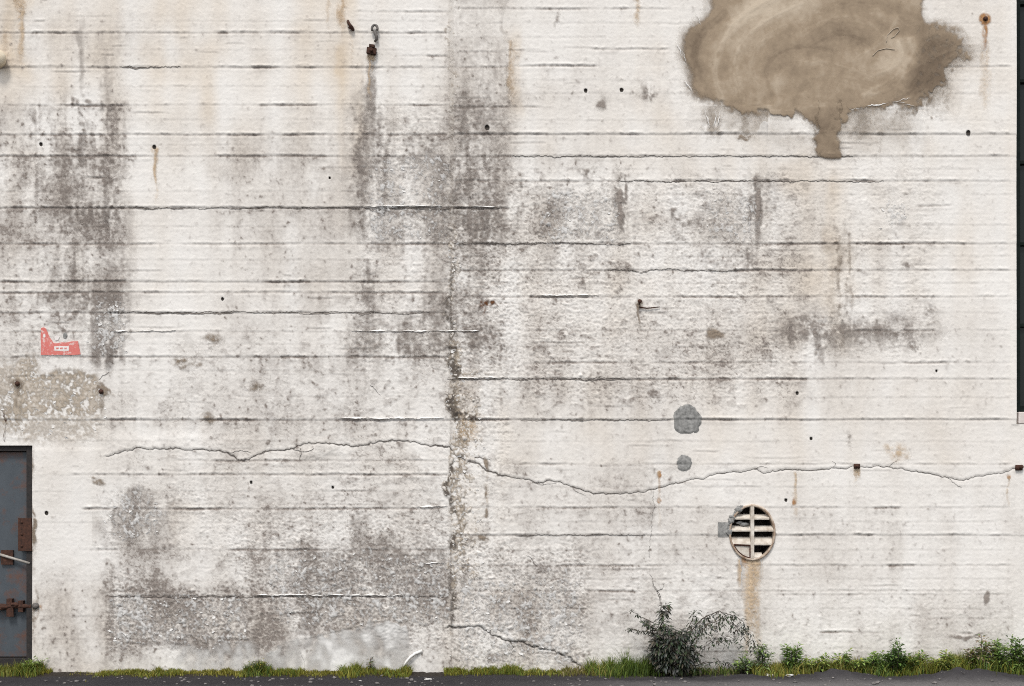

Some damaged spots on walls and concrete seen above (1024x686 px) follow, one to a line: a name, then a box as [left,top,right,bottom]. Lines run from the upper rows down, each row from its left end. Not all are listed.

water stain [364,68,380,137]
water stain [453,182,500,245]
water stain [615,185,627,227]
water stain [749,177,762,238]
water stain [94,327,114,363]
water stain [707,329,724,339]
water stain [781,316,909,348]
spalling [0,359,107,440]
crack [109,440,851,563]
water stain [299,546,439,609]
corrosion [738,558,760,626]
water stain [132,599,210,649]